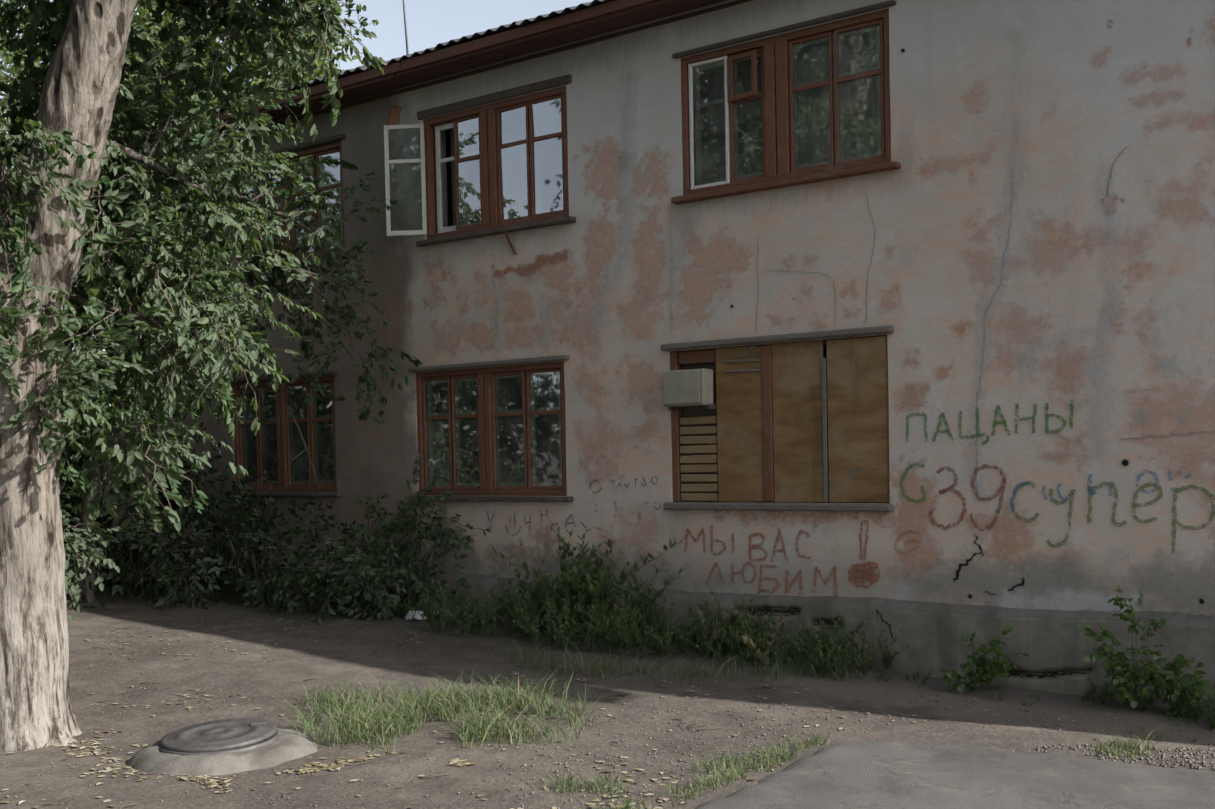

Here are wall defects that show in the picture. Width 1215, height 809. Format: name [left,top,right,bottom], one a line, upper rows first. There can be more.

crack [1107,146,1129,198]
crack [864,196,875,325]
crack [975,169,1014,495]
crack [951,534,1049,596]